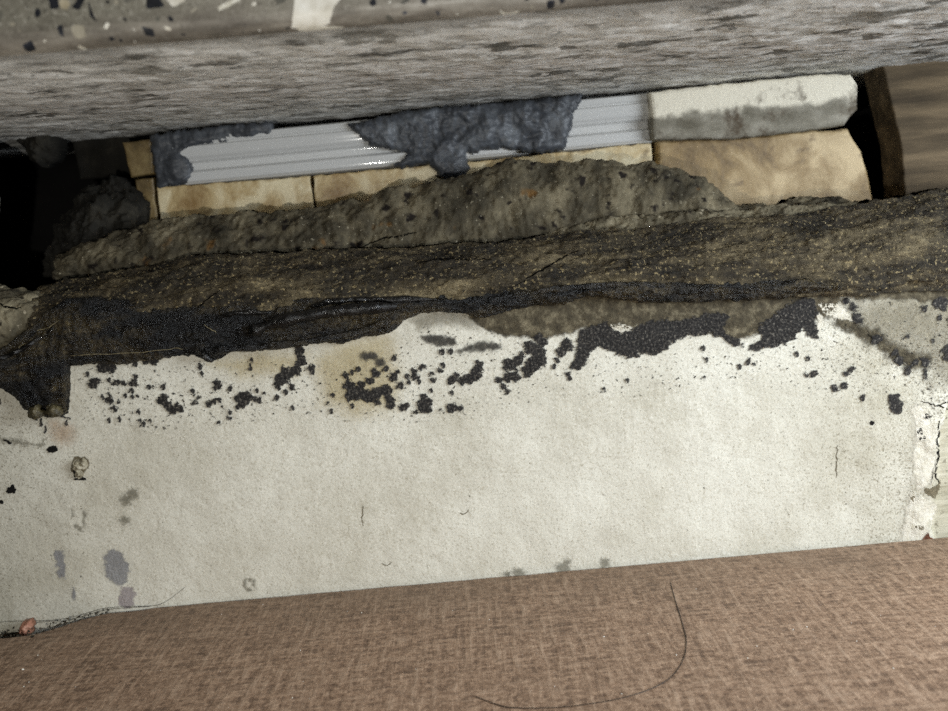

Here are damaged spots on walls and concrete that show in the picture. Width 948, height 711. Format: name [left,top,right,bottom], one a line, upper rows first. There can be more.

leakage [78,290,948,430]
crack [922,401,948,485]